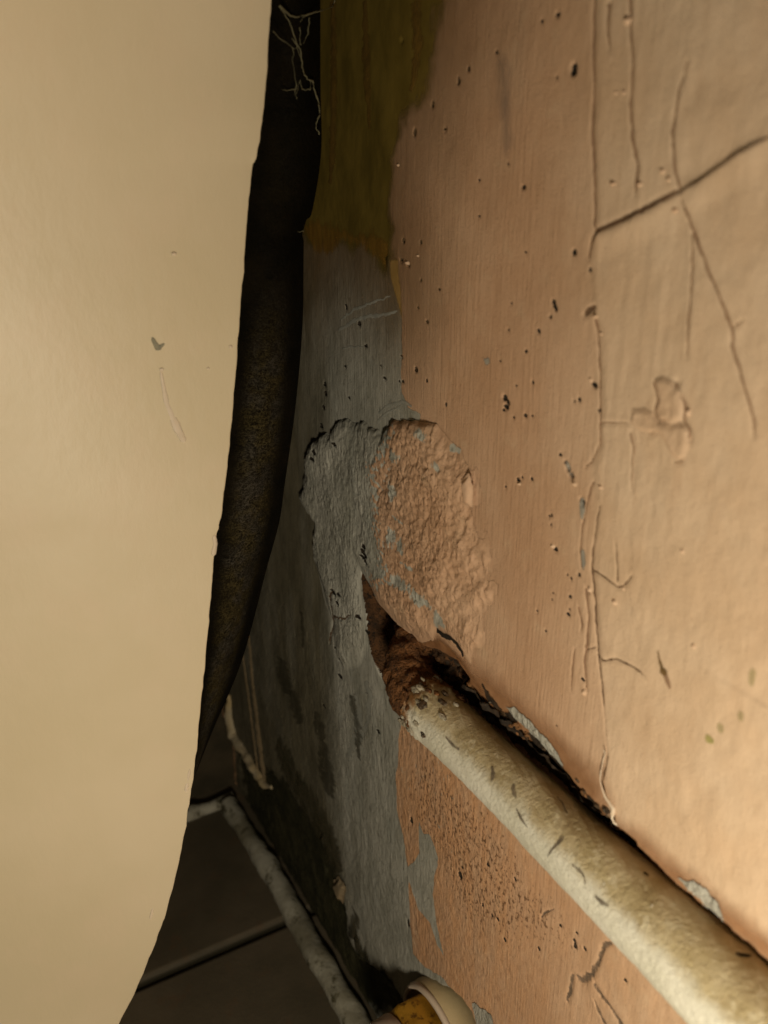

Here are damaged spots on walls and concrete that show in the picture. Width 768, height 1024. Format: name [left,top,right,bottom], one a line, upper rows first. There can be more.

damp [303,0,443,312]
crack [588,0,768,436]
peeling [223,233,449,1018]
spalling [419,642,470,695]
crack [571,305,642,708]